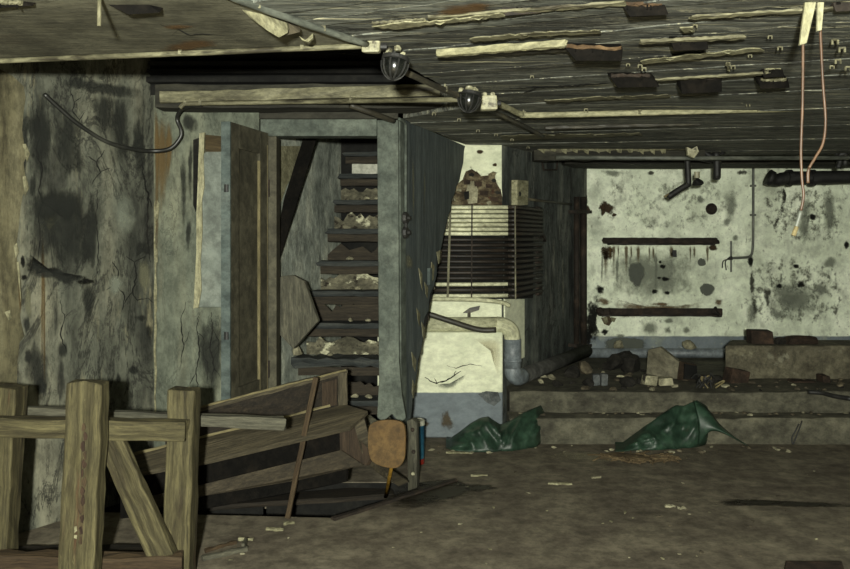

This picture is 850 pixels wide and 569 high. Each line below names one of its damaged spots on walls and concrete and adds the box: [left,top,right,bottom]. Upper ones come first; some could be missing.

damp [22,107,82,172]
damp [70,78,145,176]
damp [25,348,47,394]
damp [21,178,96,317]
crack [89,151,153,310]
crack [180,302,220,389]
flaking render [451,166,502,205]
damp [587,286,644,348]
corrosion [602,246,654,267]
damp [616,256,686,292]
damp [748,257,840,323]
damp [765,190,841,240]